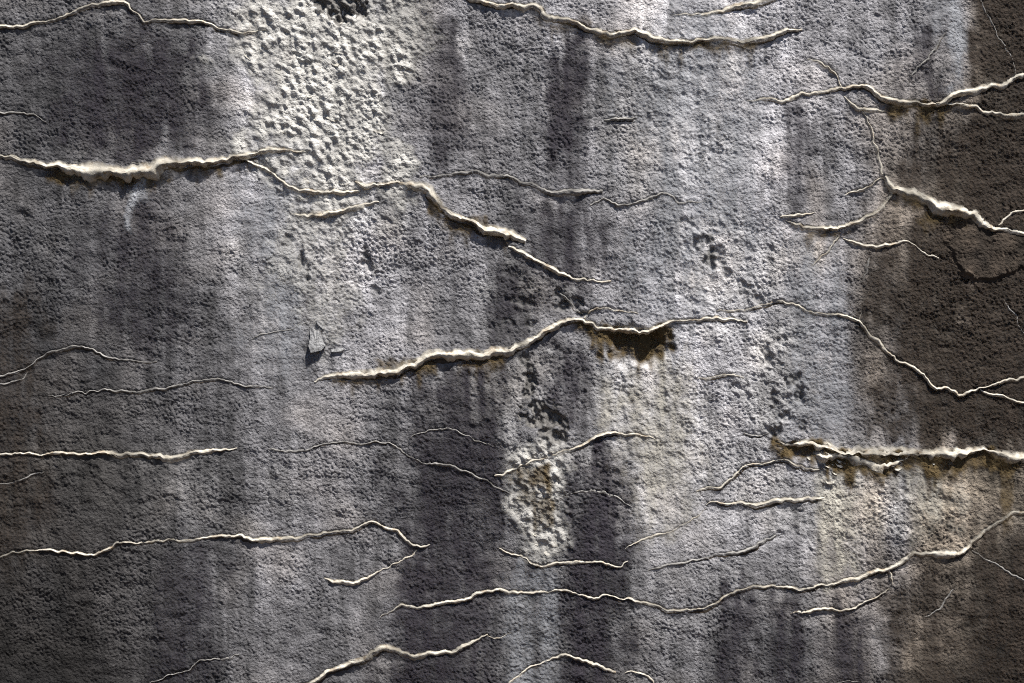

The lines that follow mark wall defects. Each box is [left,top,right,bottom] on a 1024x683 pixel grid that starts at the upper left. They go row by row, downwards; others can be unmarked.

peeling [308,320,344,353]
crack [0,147,1024,404]
leakage [546,35,590,161]
leakage [542,206,604,283]
crack [747,1,1024,274]
leakage [898,0,1024,451]
crack [1,521,430,586]
leakage [394,363,500,683]
leakage [547,437,630,683]
crack [380,432,1024,618]
peeling [806,451,849,486]
crack [310,633,510,683]